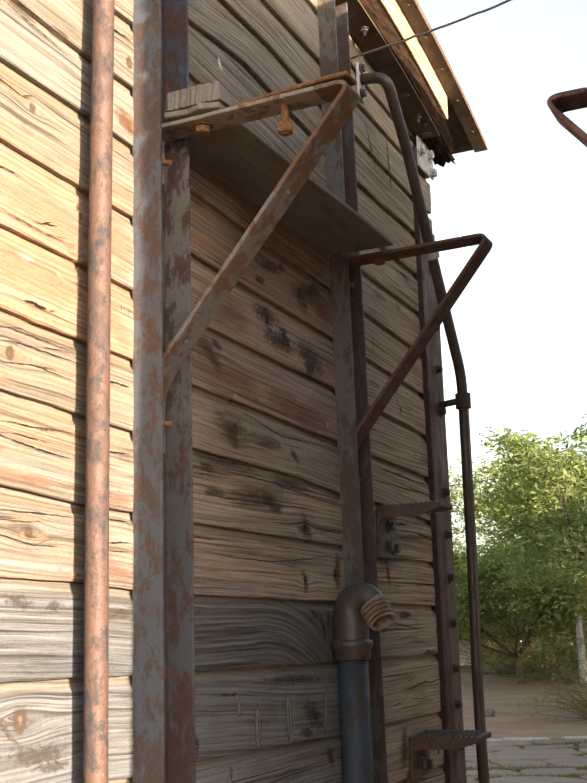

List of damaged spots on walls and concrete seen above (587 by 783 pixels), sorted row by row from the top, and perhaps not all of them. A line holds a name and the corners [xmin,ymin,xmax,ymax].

leakage [255,305,322,377]